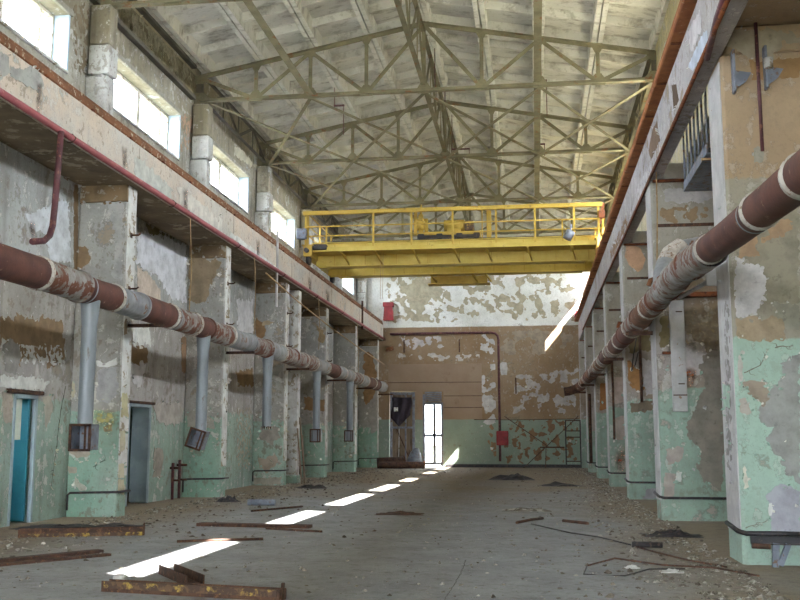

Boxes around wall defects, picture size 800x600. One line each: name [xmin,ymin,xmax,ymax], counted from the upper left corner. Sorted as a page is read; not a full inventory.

peeling [133,223,222,304]
peeling [0,312,67,428]
peeling [386,274,603,464]
peeling [666,206,800,532]
crack [744,343,793,375]